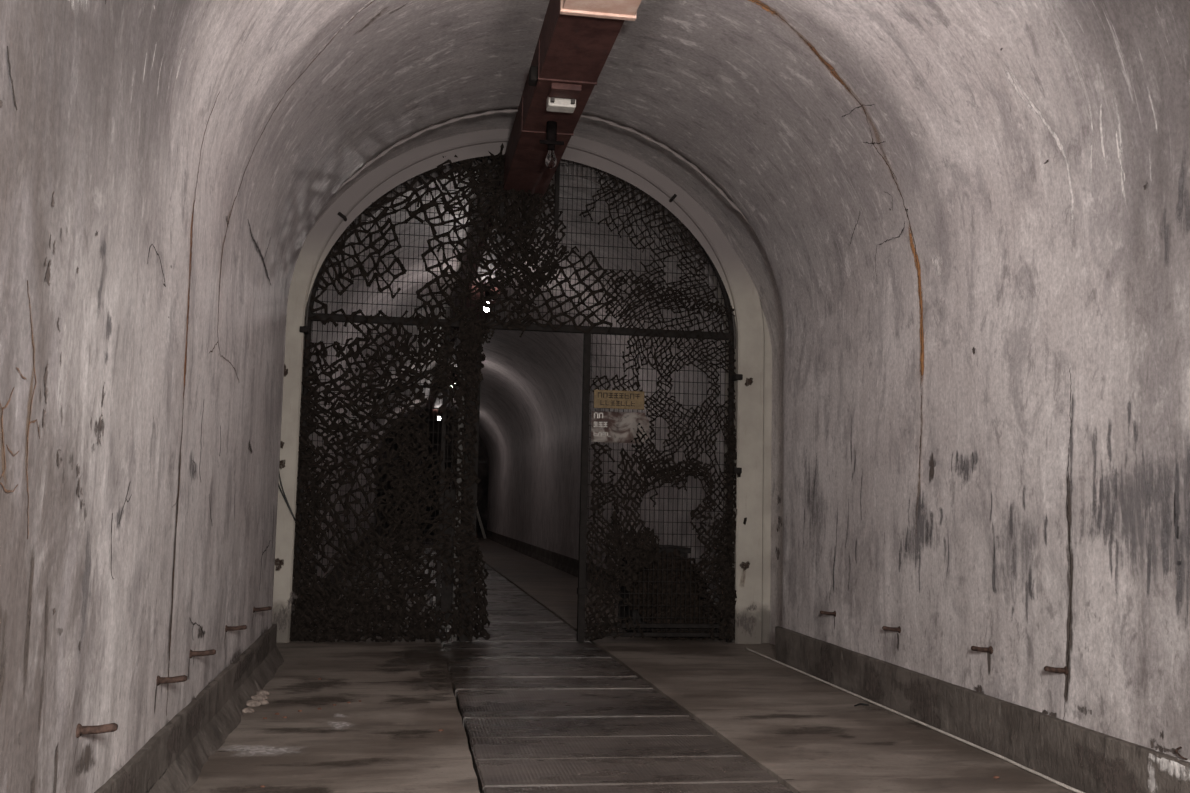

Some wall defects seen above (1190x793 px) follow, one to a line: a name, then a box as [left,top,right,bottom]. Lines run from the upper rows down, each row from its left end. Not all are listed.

corrosion [748,0,941,376]
crack [0,280,40,539]
damp [1081,402,1190,621]